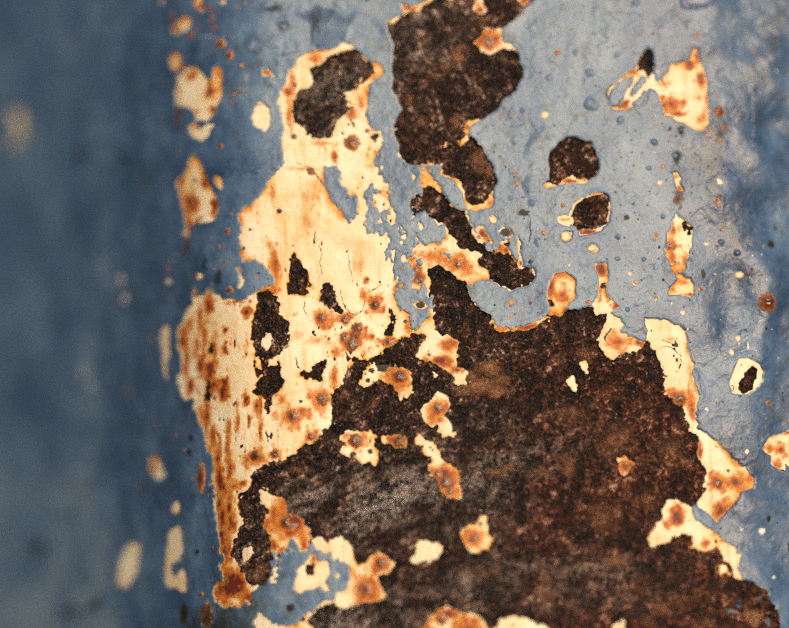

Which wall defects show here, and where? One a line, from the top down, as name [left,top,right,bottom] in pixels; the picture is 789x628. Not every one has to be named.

peeling [161,0,779,628]
corrosion [752,292,776,312]
peeling [763,430,789,475]
corrosion [191,462,209,497]